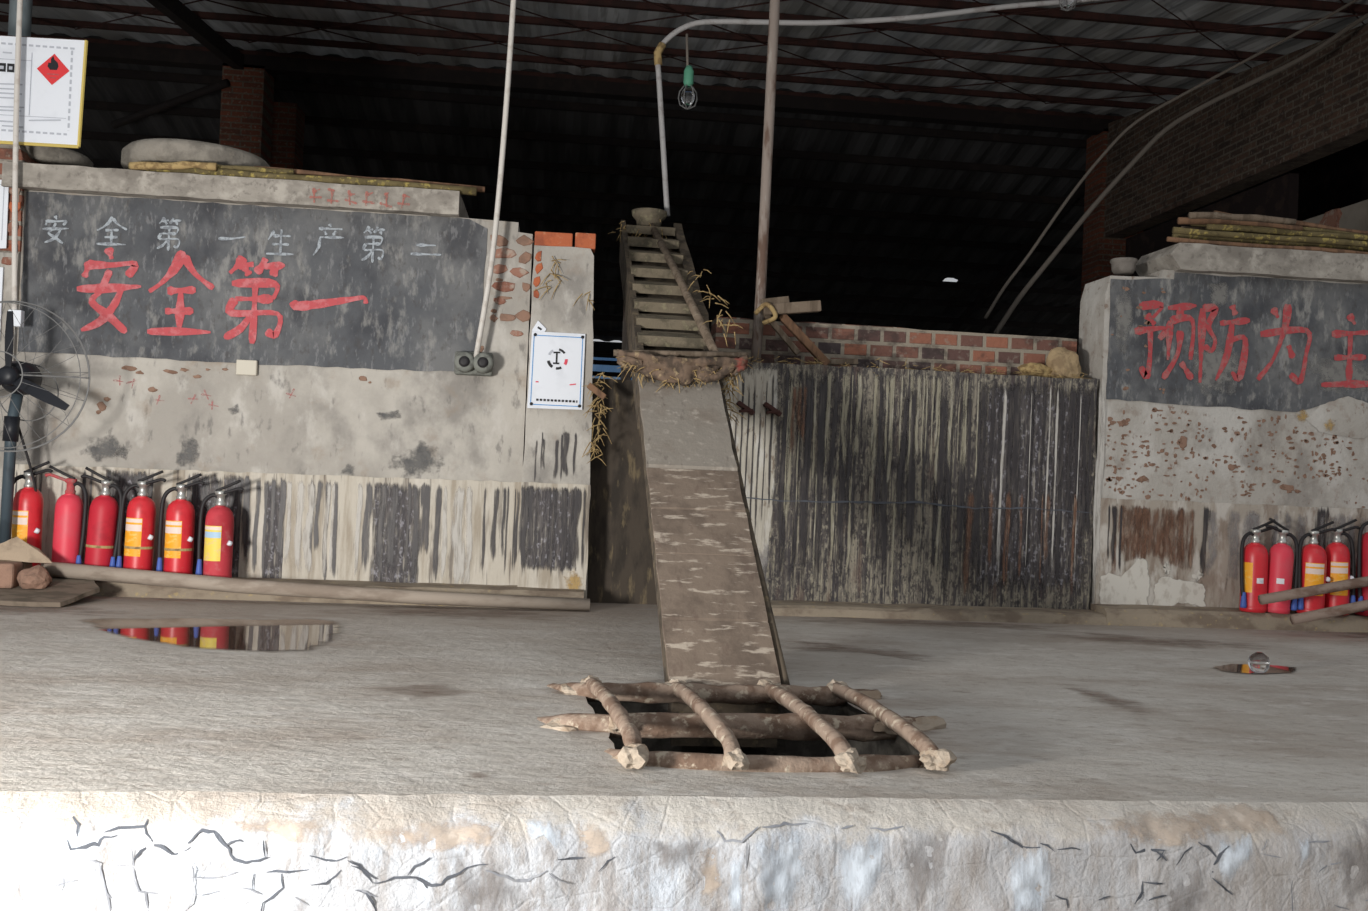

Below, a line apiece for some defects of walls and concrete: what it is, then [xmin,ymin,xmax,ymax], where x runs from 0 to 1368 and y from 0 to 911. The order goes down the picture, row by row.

flaking render [1,188,21,265]
flaking render [490,235,543,337]
spalling [1106,388,1368,501]
water stain [177,440,387,580]
water stain [399,432,586,589]
corrosion [1112,506,1194,570]
crack [55,816,615,911]
crack [717,821,807,868]
crack [841,824,903,832]
crack [990,830,1081,852]
crack [1055,842,1233,907]
crack [1262,840,1341,911]